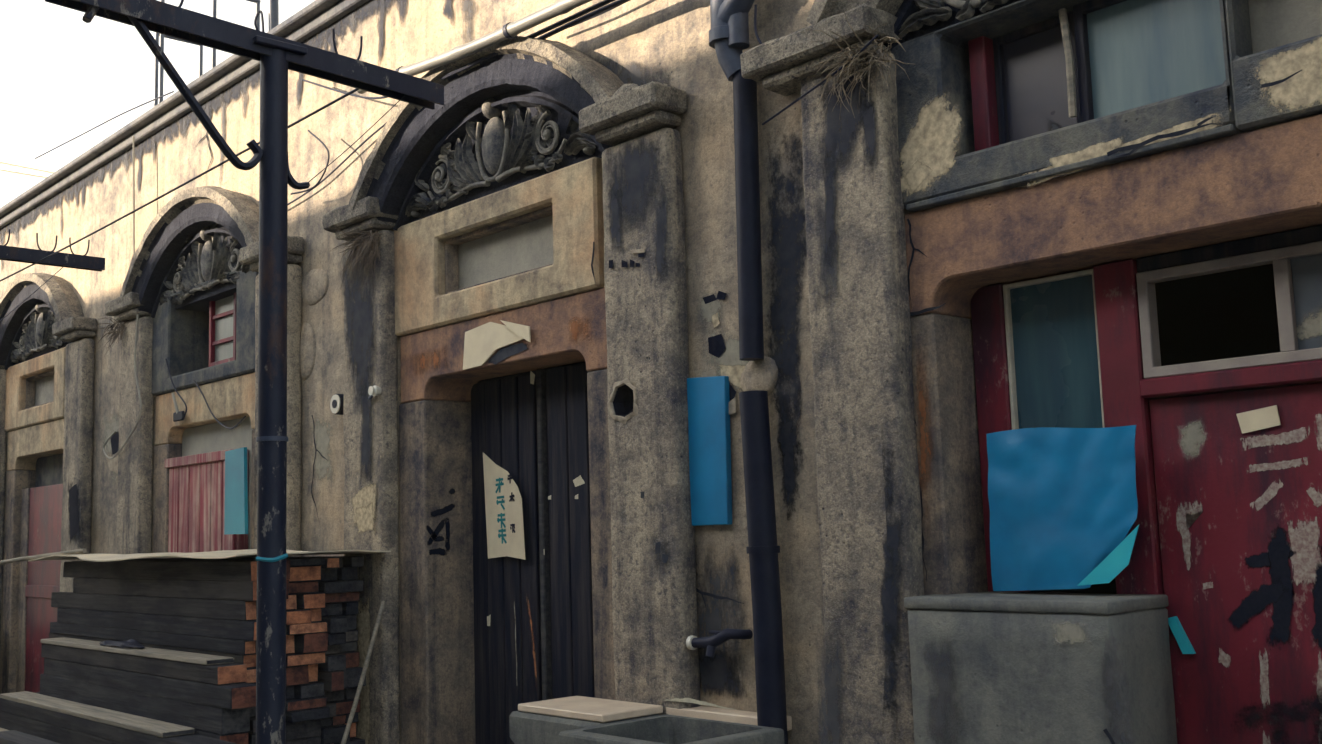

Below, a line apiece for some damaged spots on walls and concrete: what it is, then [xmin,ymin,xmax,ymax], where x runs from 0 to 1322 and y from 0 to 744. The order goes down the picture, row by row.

damp [301,0,407,63]
damp [443,0,476,42]
damp [592,58,655,86]
peeling [1257,37,1322,112]
damp [0,68,260,271]
peeling [900,94,961,198]
peeling [1022,113,1223,186]
crack [1107,116,1223,157]
damp [607,140,667,280]
damp [766,66,876,520]
damp [817,632,842,744]